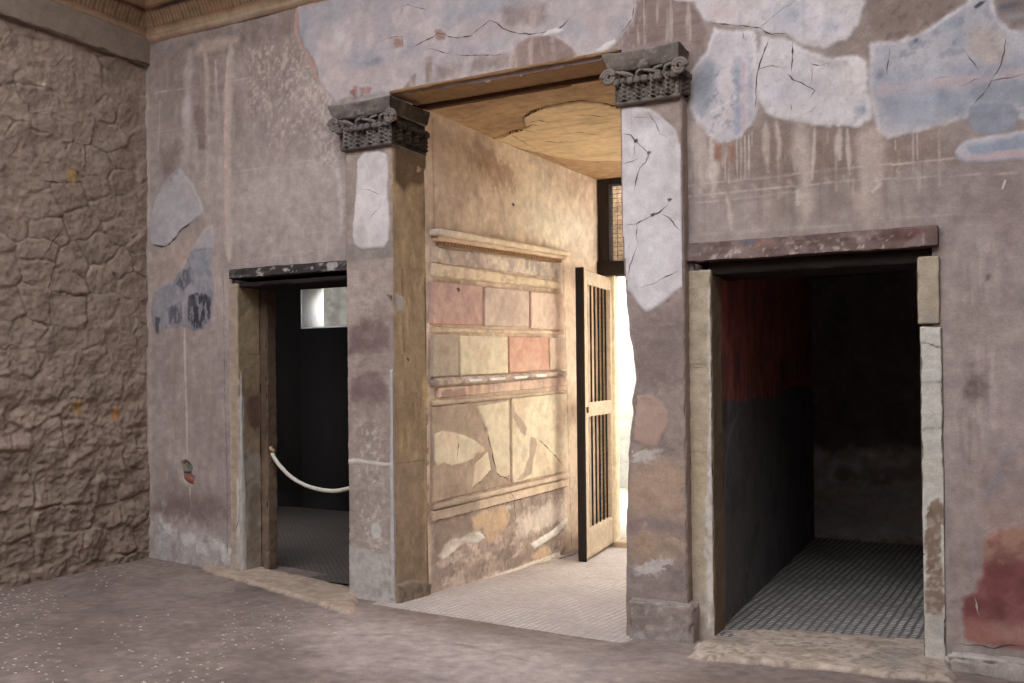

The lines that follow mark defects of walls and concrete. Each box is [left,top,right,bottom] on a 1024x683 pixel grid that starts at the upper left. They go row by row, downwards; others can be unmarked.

crack [377,18,570,56]
crack [708,5,832,114]
crack [940,40,1019,106]
crack [624,112,678,289]
leakage [687,114,898,235]
crack [439,422,562,525]